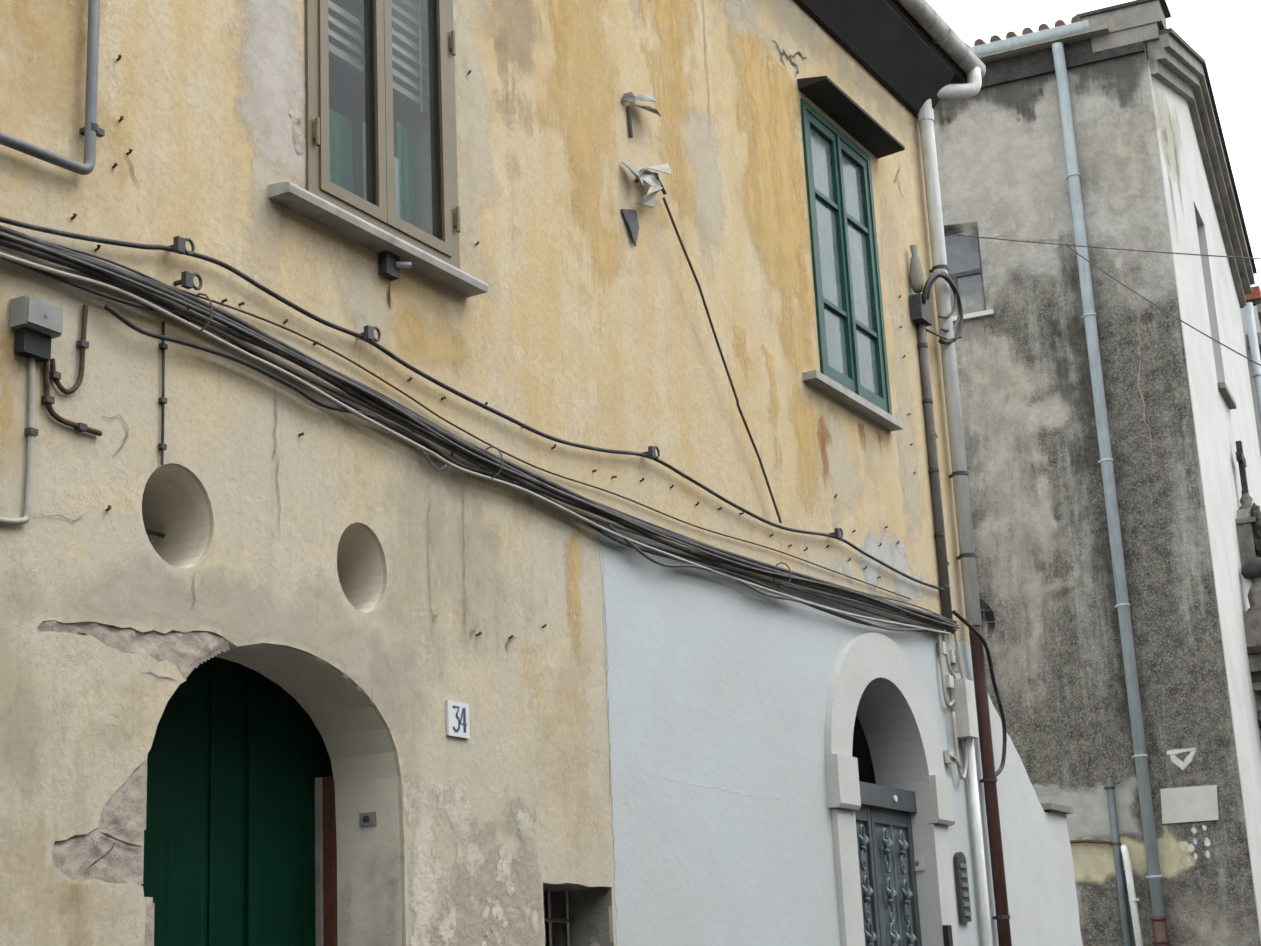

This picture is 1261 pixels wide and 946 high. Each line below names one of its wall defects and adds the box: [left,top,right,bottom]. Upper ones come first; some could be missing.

water stain [551,0,619,279]
water stain [641,0,723,240]
water stain [727,0,813,367]
crack [773,41,807,73]
water stain [934,72,1064,248]
water stain [1071,53,1148,106]
water stain [793,390,862,516]
water stain [953,301,1091,691]
spalling [37,620,235,679]
peeling [403,780,545,946]